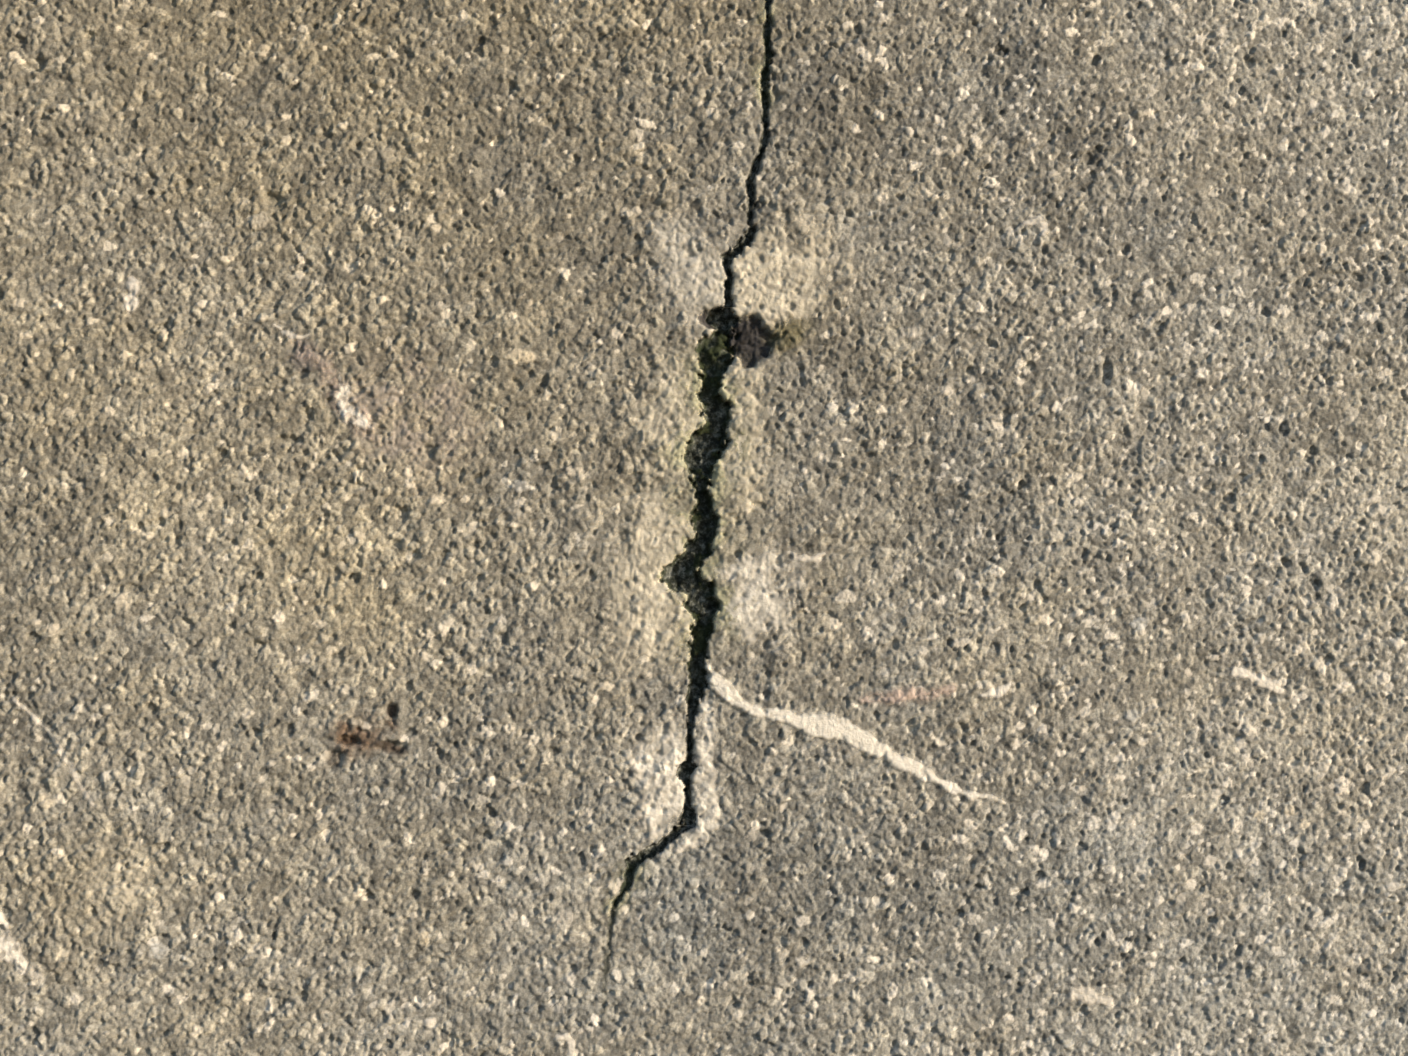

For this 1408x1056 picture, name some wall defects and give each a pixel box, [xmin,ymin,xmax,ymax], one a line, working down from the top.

crack [610,0,774,926]